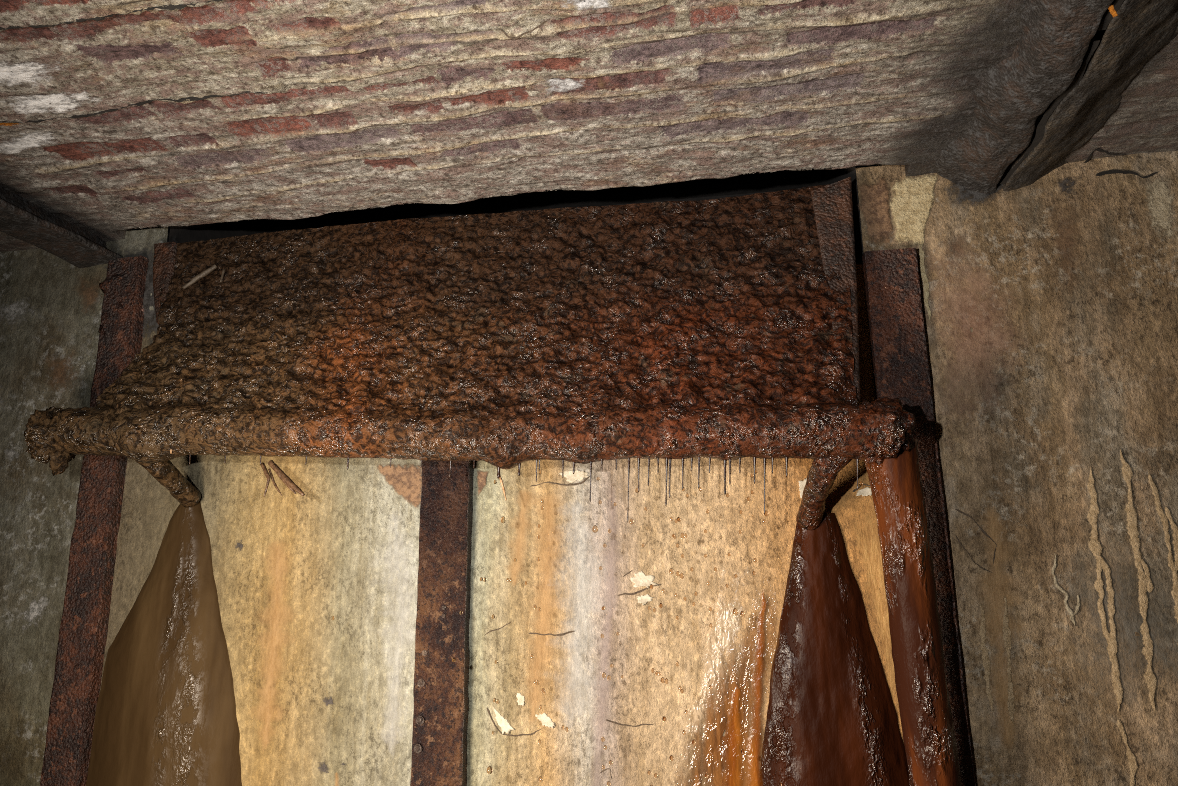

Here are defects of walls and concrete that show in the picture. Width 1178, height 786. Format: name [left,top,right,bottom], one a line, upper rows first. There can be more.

crack [0,0,223,30]
leakage [687,593,774,786]
rust [760,513,910,786]
leakage [1052,554,1080,625]
leakage [1087,450,1167,786]
leakage [1148,473,1178,623]